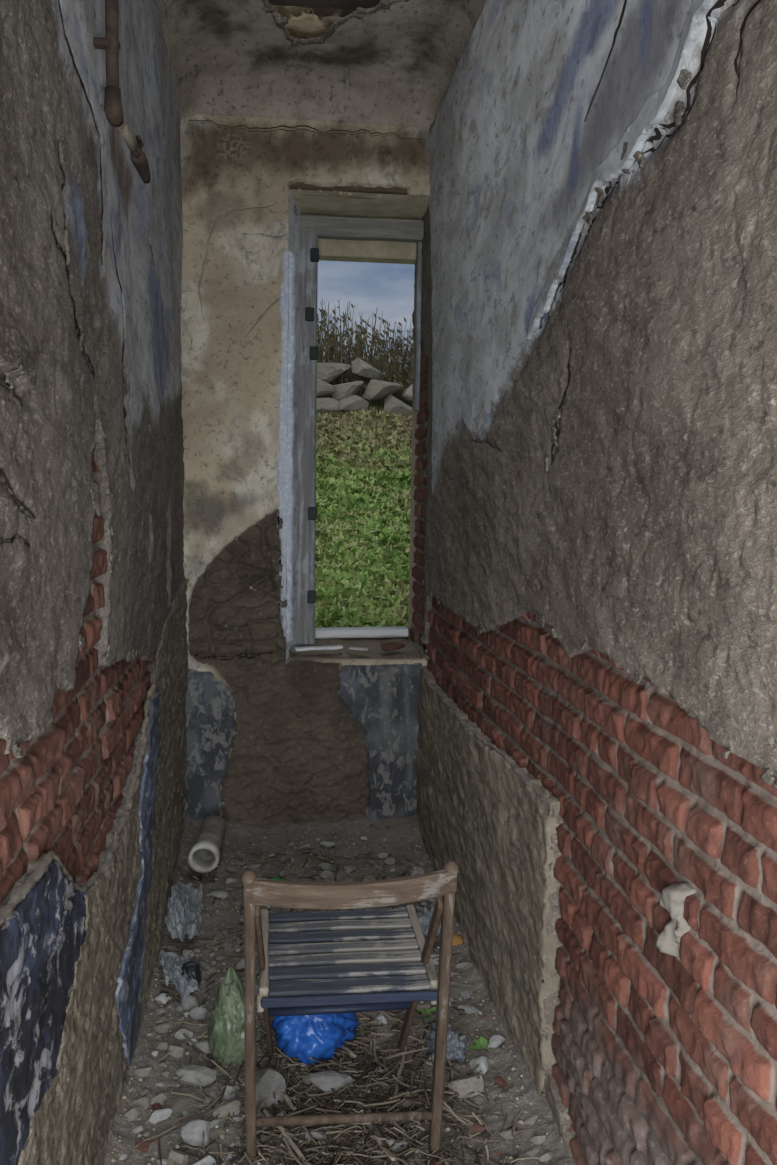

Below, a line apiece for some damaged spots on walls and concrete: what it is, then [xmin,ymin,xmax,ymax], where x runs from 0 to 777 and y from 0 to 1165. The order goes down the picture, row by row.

crack [51,0,127,442]
spalling [261,0,409,47]
peeling [526,0,715,340]
crack [538,0,761,329]
crack [0,468,35,547]
crack [544,348,571,473]
spalling [0,250,777,1165]